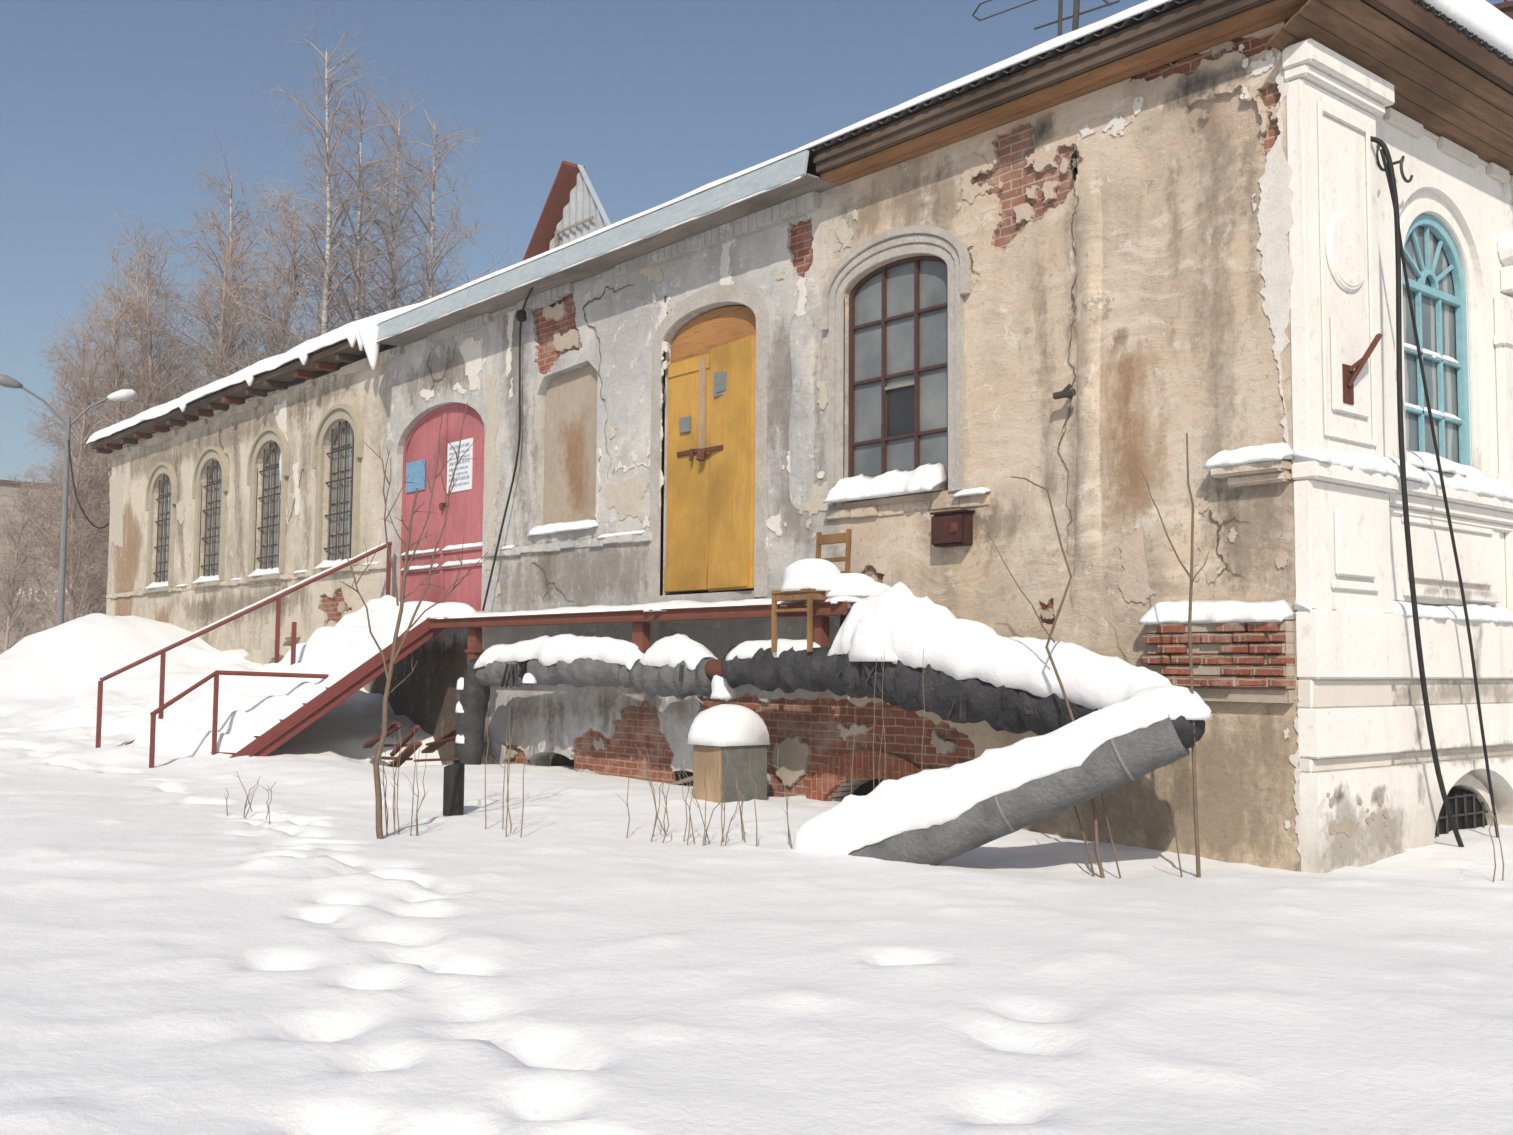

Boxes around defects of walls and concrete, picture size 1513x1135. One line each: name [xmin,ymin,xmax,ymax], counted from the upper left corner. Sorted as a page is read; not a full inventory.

peeling [719,239,736,285]
flaking render [776,214,814,318]
peeling [836,209,859,251]
flaking render [957,33,1294,444]
peeling [420,388,435,401]
flaking render [535,293,582,374]
crack [1057,144,1082,599]
peeling [453,307,516,597]
crack [1209,510,1249,586]
flaking render [320,589,352,624]
flaking render [573,700,676,783]
flaking render [700,694,975,797]